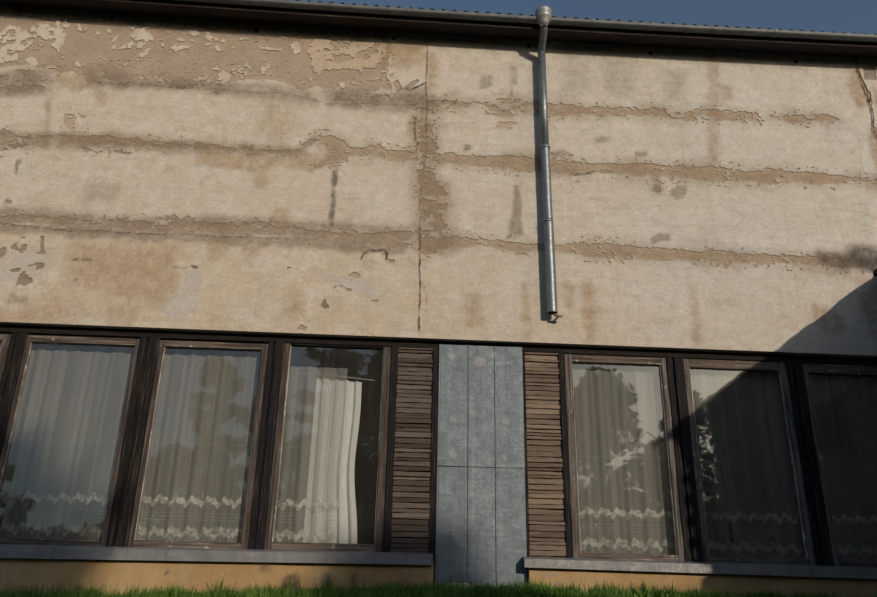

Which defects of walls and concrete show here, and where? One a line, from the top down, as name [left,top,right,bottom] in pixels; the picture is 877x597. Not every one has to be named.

peeling [0,4,877,286]